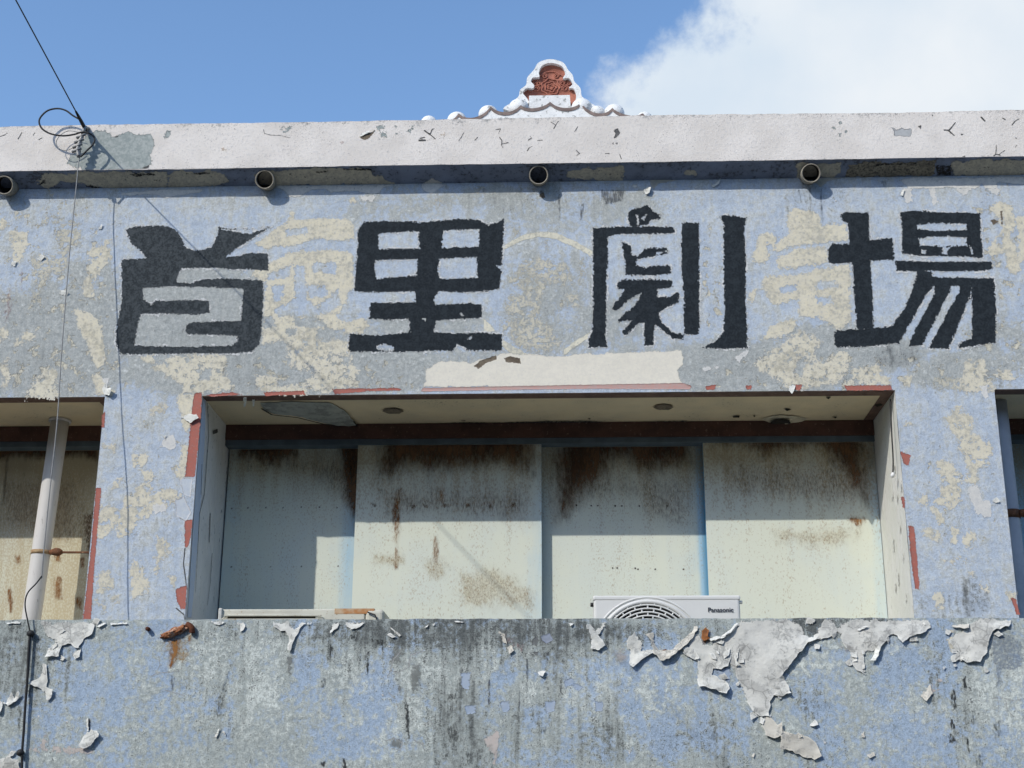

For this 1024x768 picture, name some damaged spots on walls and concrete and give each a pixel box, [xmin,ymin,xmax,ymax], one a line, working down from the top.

spalling [36,130,229,198]
peeling [796,158,1024,275]
peeling [735,208,913,407]
peeling [0,208,401,712]
peeling [892,358,1018,603]
peeling [0,718,99,768]
corrosion [169,635,191,668]
leakage [366,638,404,673]
leakage [392,704,410,747]
leakage [398,657,423,691]
peeling [626,591,945,760]
peeling [921,591,1020,701]